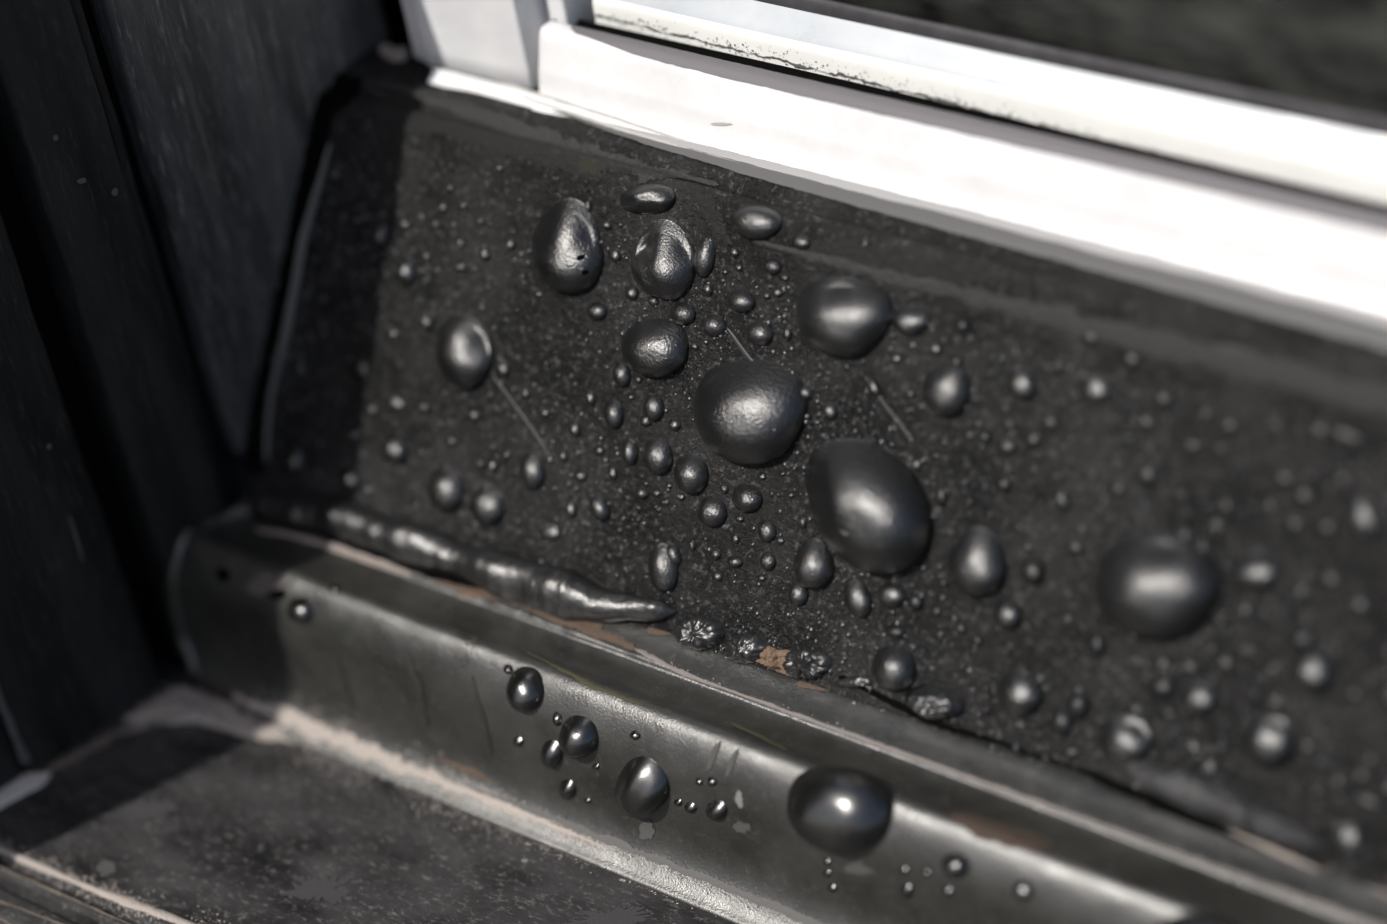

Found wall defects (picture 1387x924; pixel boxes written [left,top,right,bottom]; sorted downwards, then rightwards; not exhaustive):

mould [586,13,1213,164]
peeling [782,647,833,680]
water stain [707,741,739,778]
water stain [639,820,655,840]
water stain [733,790,751,833]
water stain [843,861,877,876]